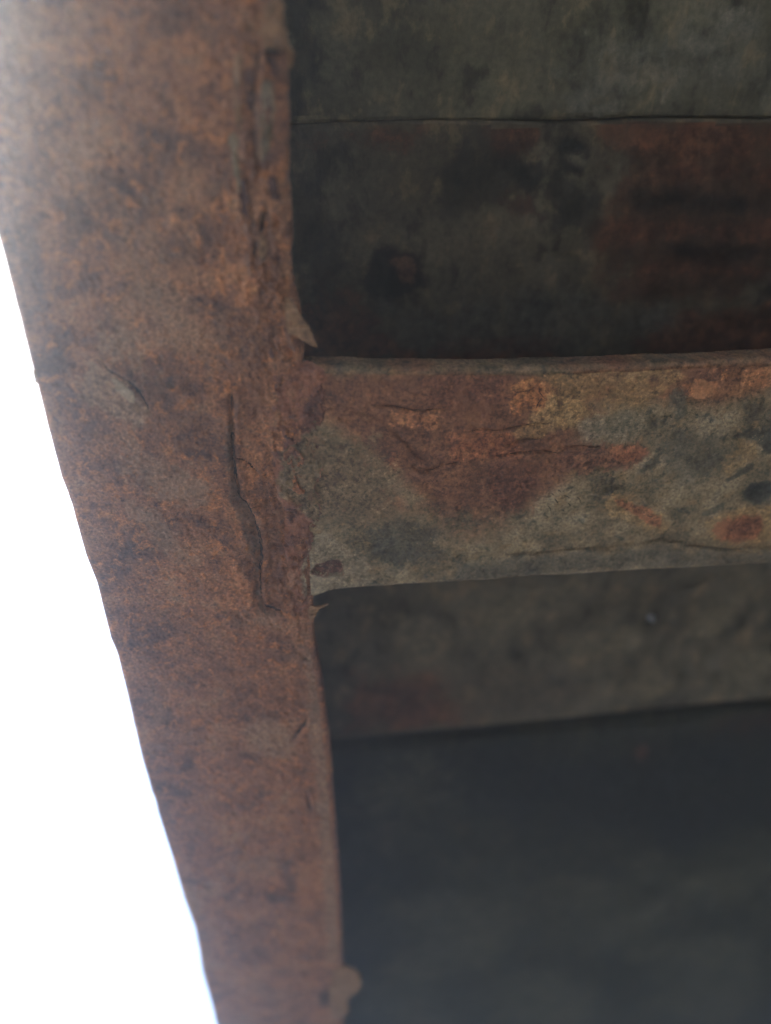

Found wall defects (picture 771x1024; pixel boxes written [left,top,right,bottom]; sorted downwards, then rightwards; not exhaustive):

water stain [283,0,771,359]
rust [284,296,380,358]
rust [211,427,289,625]
crack [225,383,281,616]
rust [301,366,771,539]
rust [697,500,771,553]
rust [328,963,361,1021]